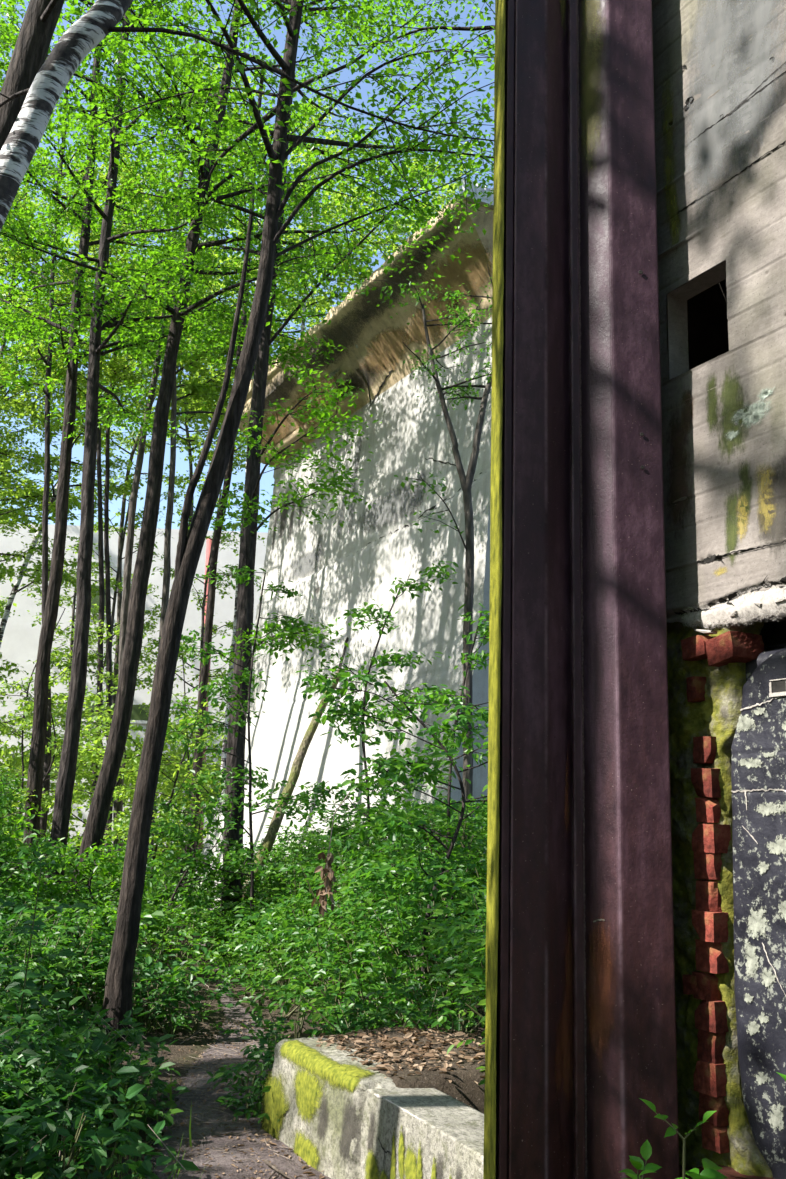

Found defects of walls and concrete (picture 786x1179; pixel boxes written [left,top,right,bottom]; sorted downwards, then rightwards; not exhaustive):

damp [707,375,747,455]
damp [667,391,693,524]
damp [715,456,786,575]
damp [317,1099,328,1137]
damp [339,1103,374,1158]